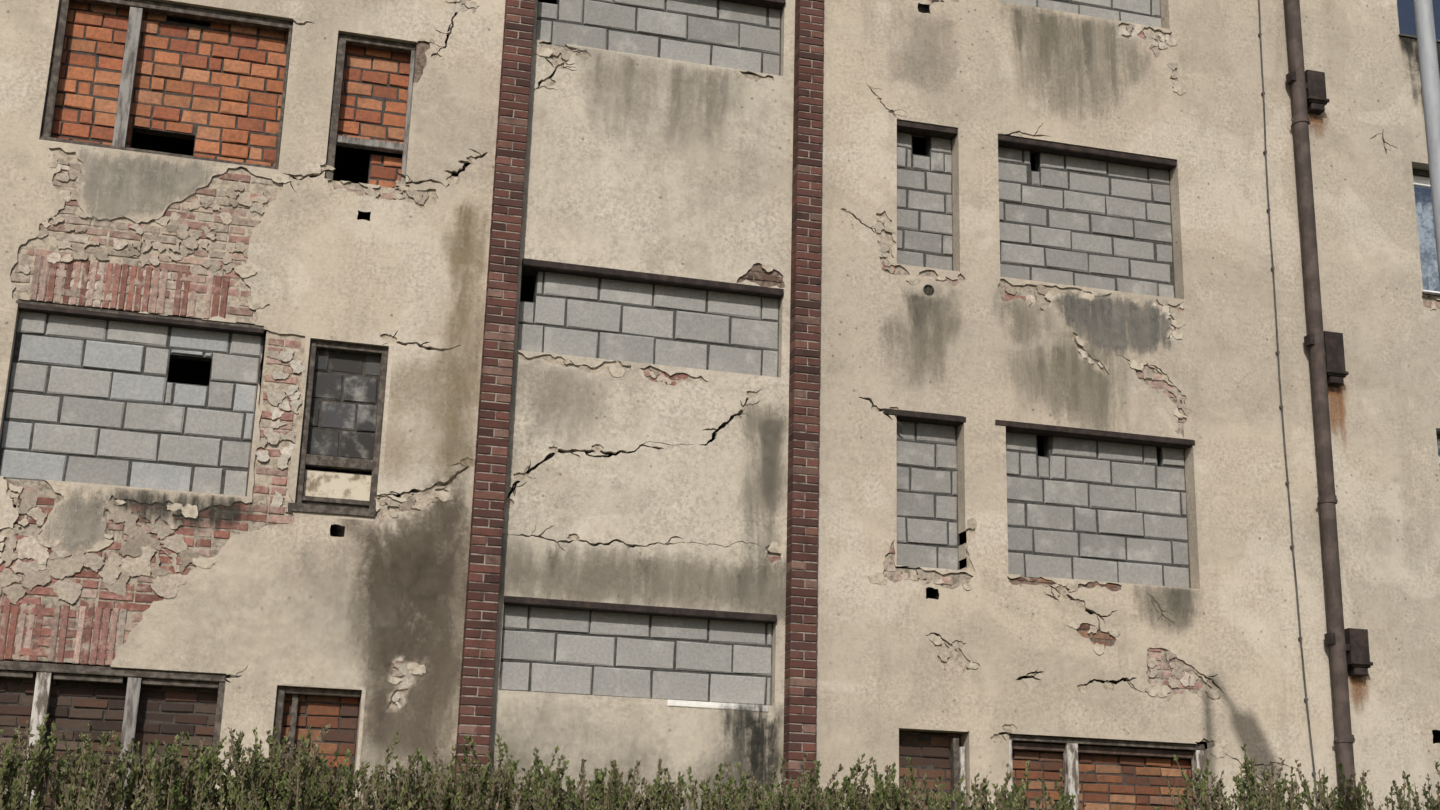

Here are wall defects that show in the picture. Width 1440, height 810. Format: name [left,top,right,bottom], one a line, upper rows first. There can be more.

water stain [1401,36,1422,96]
flaking render [1071,333,1109,377]
flaking render [1151,300,1186,344]
flaking render [0,148,306,666]
flaking render [1128,360,1192,436]
crack [370,457,475,505]
crack [504,390,760,550]
water stain [351,500,468,810]
flaking render [1067,618,1120,655]
flaking render [1145,648,1221,702]
water stain [491,726,663,810]
water stain [688,704,780,810]